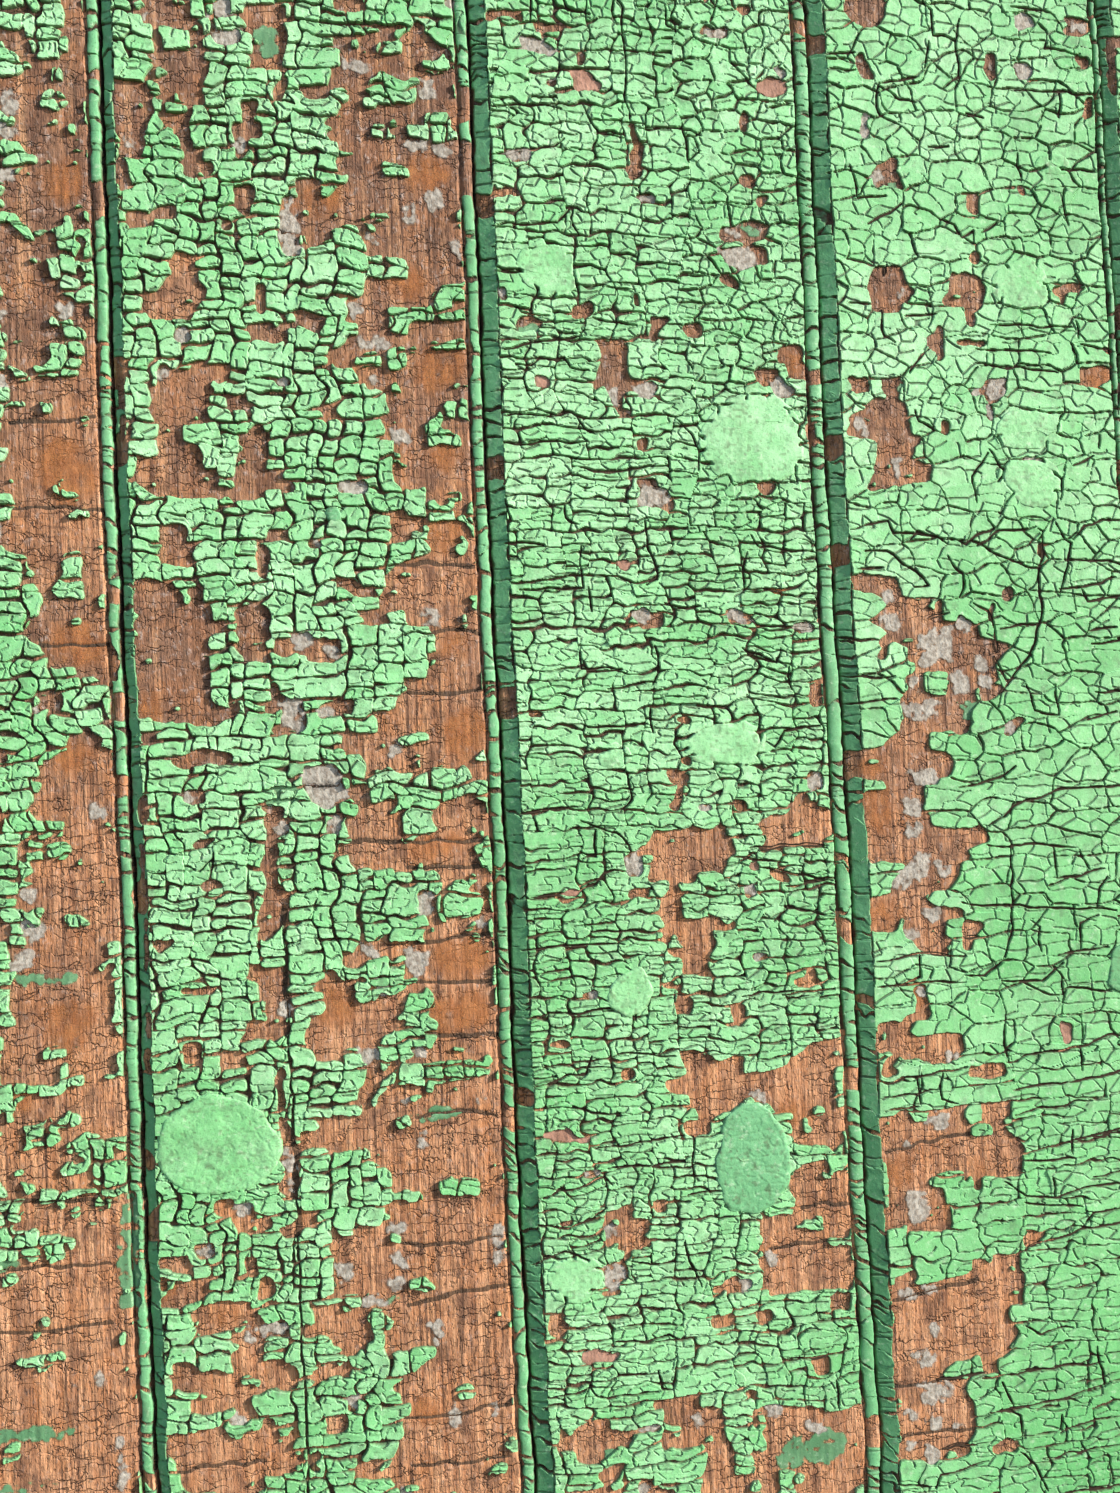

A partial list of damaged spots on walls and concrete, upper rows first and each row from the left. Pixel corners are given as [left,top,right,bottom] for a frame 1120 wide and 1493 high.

crack [829,1,983,124]
peeling [747,342,820,398]
peeling [799,369,949,495]
crack [856,323,1120,720]
crack [741,535,897,705]
peeling [0,0,619,1493]
crack [508,1007,711,1285]
peeling [614,1060,641,1086]
crack [879,767,1120,1253]
peeling [553,1193,675,1296]
peeling [553,1229,1054,1493]
crack [898,1325,1120,1493]